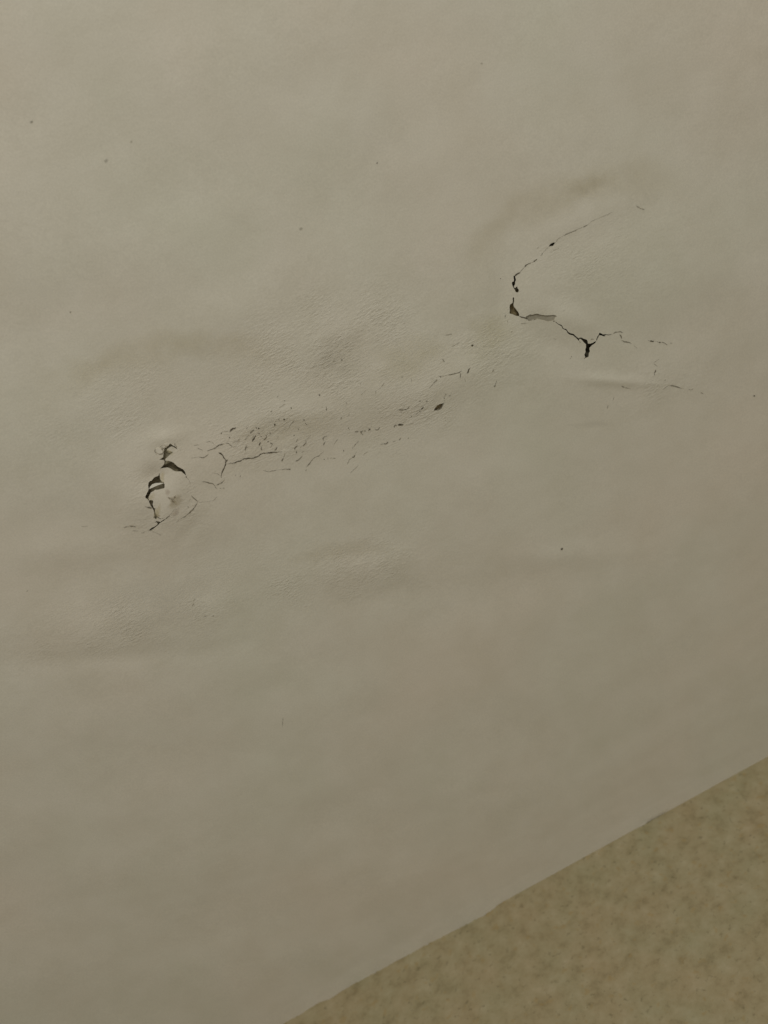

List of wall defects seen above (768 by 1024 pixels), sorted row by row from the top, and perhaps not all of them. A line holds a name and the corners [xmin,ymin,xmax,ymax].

crack [500,225,667,359]
peeling [145,443,187,530]
crack [185,368,470,517]